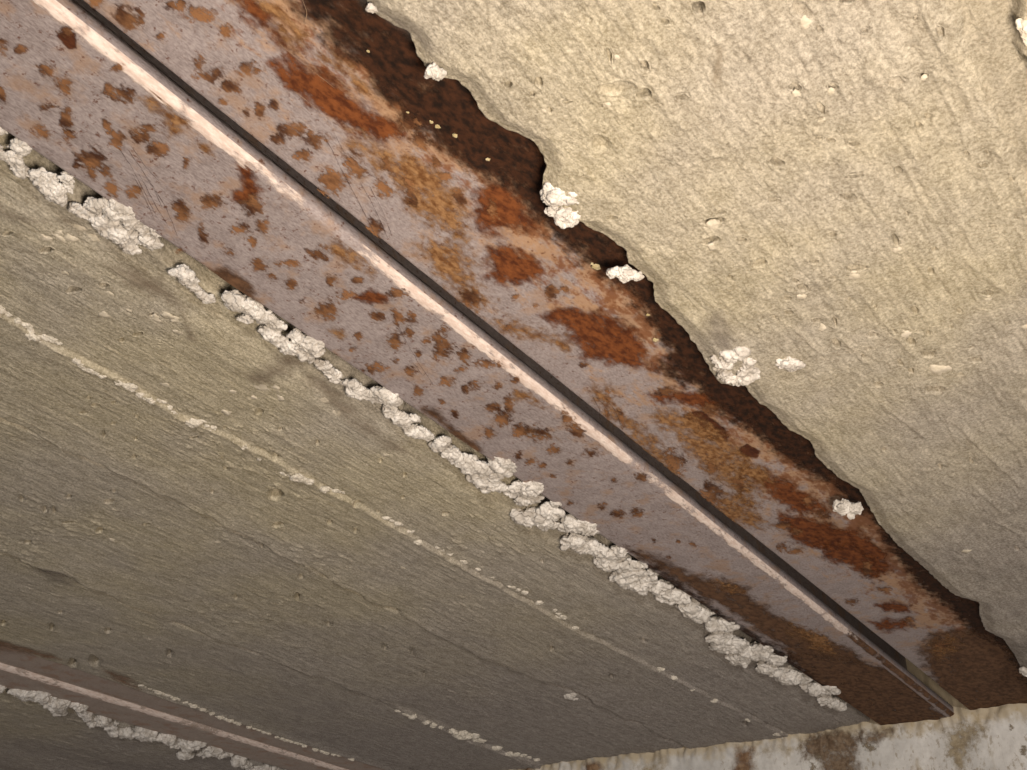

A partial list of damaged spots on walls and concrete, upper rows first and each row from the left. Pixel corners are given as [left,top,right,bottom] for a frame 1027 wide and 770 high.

corrosion [112,5,145,33]
corrosion [165,0,233,37]
spalling [788,0,825,35]
corrosion [56,27,76,49]
spalling [786,81,804,94]
corrosion [30,63,188,199]
corrosion [172,193,189,222]
peeling [539,182,579,207]
spalling [698,209,748,246]
corrosion [192,0,1027,725]
spalling [168,244,858,711]